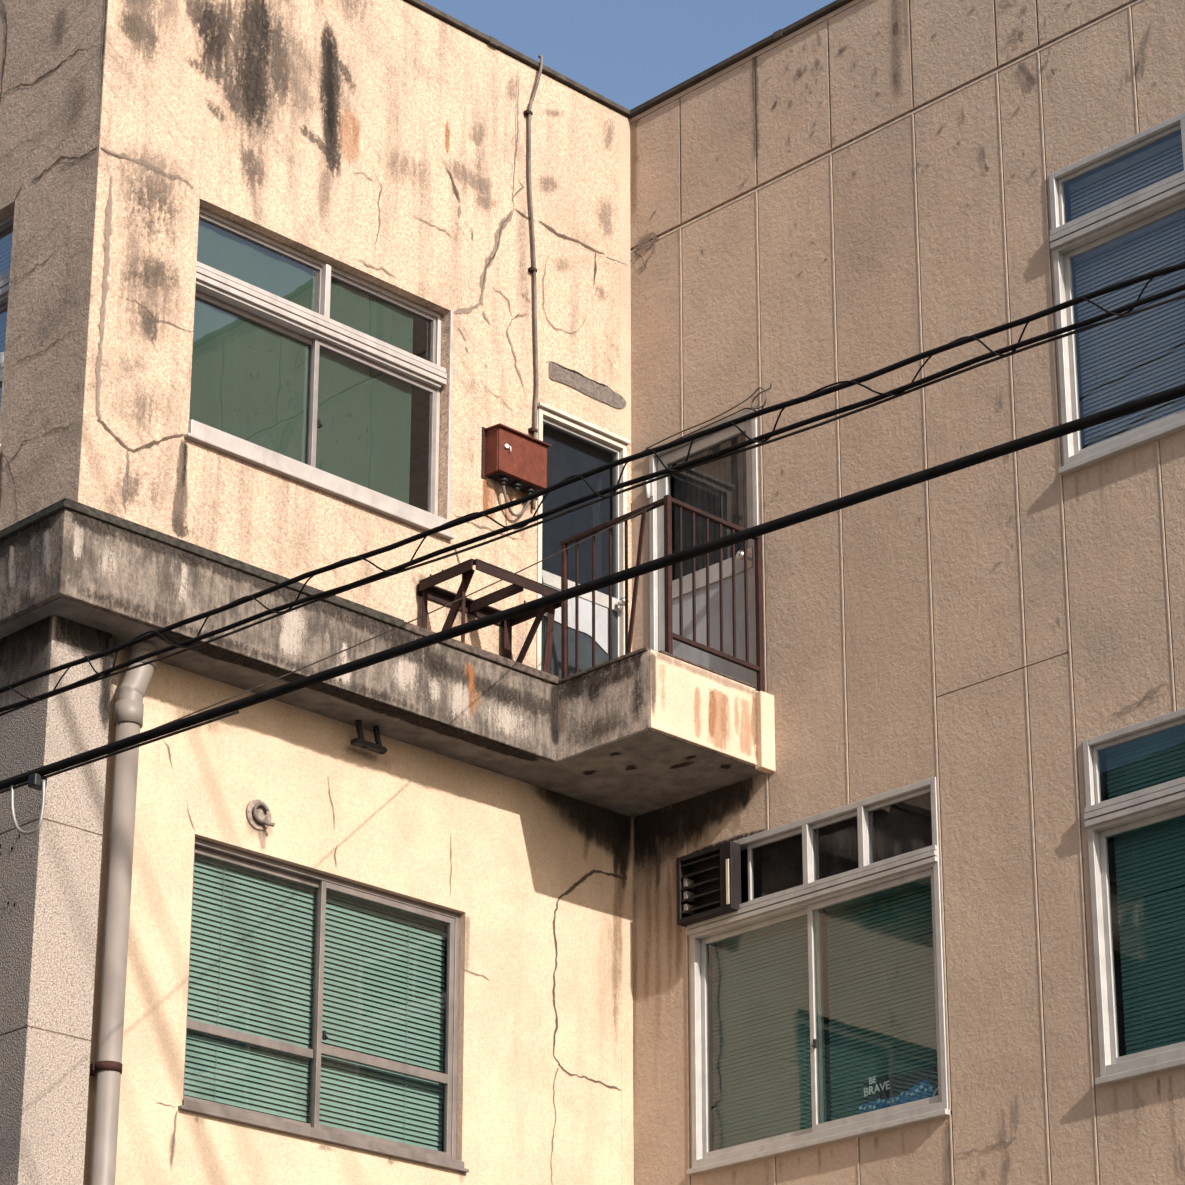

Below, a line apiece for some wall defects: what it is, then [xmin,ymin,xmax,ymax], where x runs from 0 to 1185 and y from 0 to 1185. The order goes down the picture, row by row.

crack [0,0,194,513]
leakage [134,188,176,233]
leakage [186,0,289,127]
leakage [242,148,265,185]
leakage [300,26,355,172]
crack [354,162,396,277]
crack [413,71,658,409]
leakage [0,451,51,597]
leakage [73,440,656,761]
leakage [537,778,764,950]
crack [551,870,627,1185]
crack [958,1096,1018,1185]